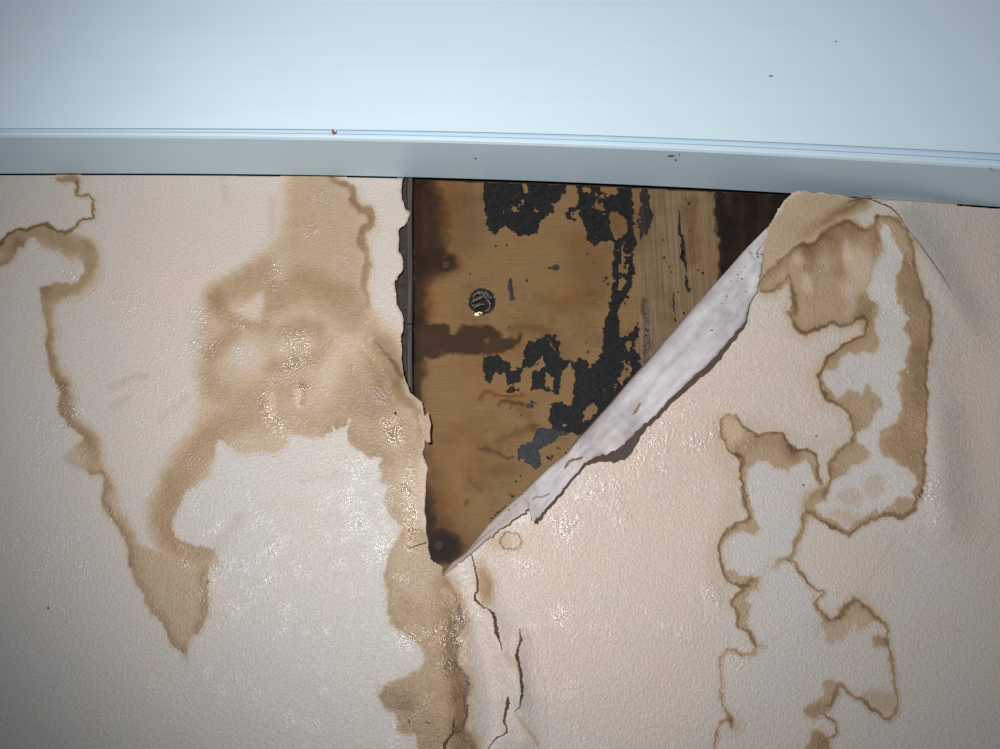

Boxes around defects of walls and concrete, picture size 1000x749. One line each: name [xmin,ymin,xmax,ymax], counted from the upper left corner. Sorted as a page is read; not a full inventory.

leakage [0,175,526,749]
crack [471,555,524,748]
peeling [518,429,567,468]
leakage [712,191,942,749]